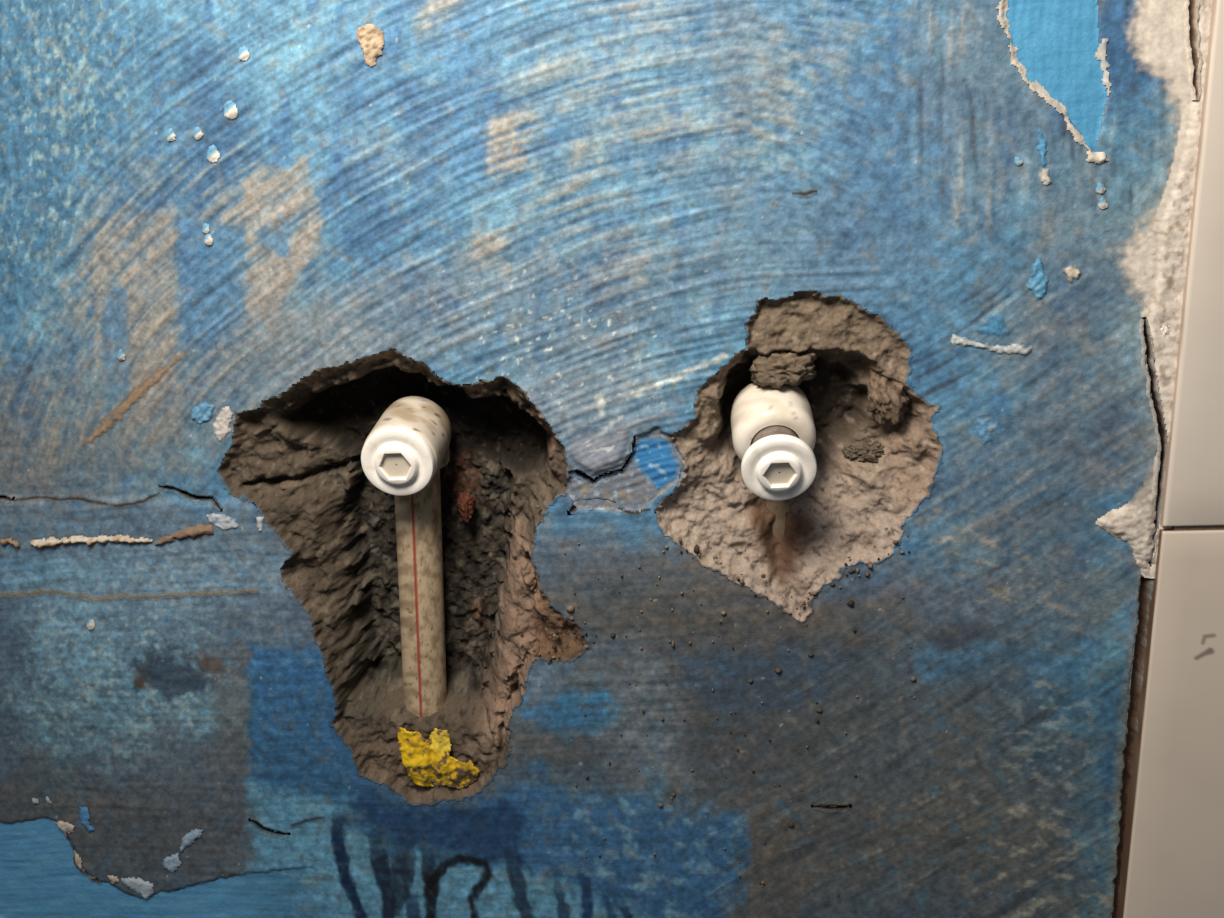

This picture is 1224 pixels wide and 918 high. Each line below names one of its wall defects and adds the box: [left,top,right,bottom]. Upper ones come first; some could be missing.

peeling [996,0,1112,164]
peeling [1121,0,1212,442]
peeling [1063,266,1081,283]
crack [0,483,223,512]
spalling [191,289,943,807]
crack [566,439,651,517]
peeling [1096,456,1172,578]
peeling [0,796,290,918]
damp [331,823,367,918]
damp [370,848,492,918]
damp [507,863,532,918]
damp [556,886,593,918]